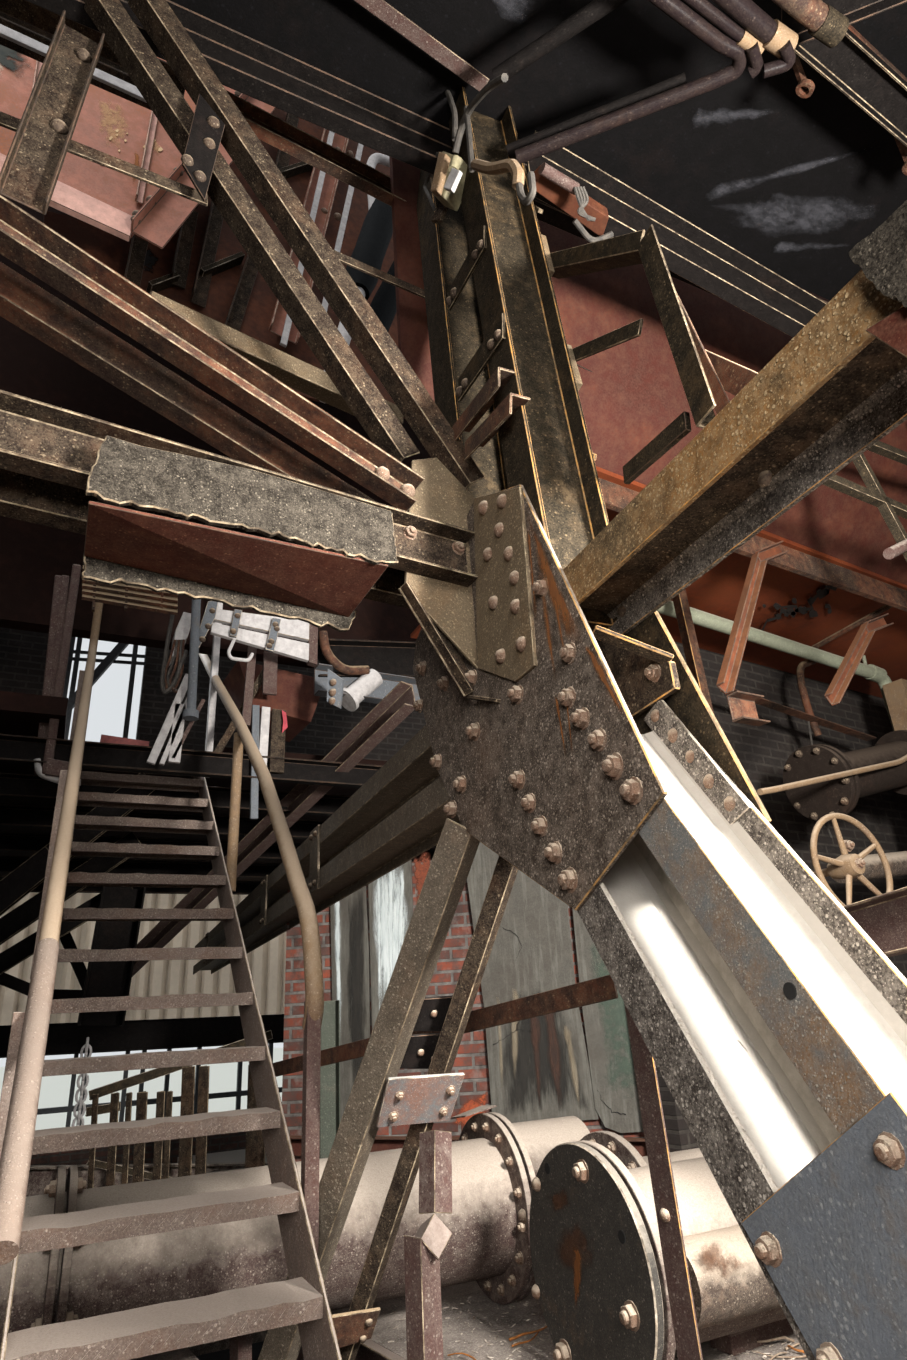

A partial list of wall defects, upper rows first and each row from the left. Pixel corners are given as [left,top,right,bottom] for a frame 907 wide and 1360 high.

corrosion [528,523,574,663]
corrosion [586,648,620,710]